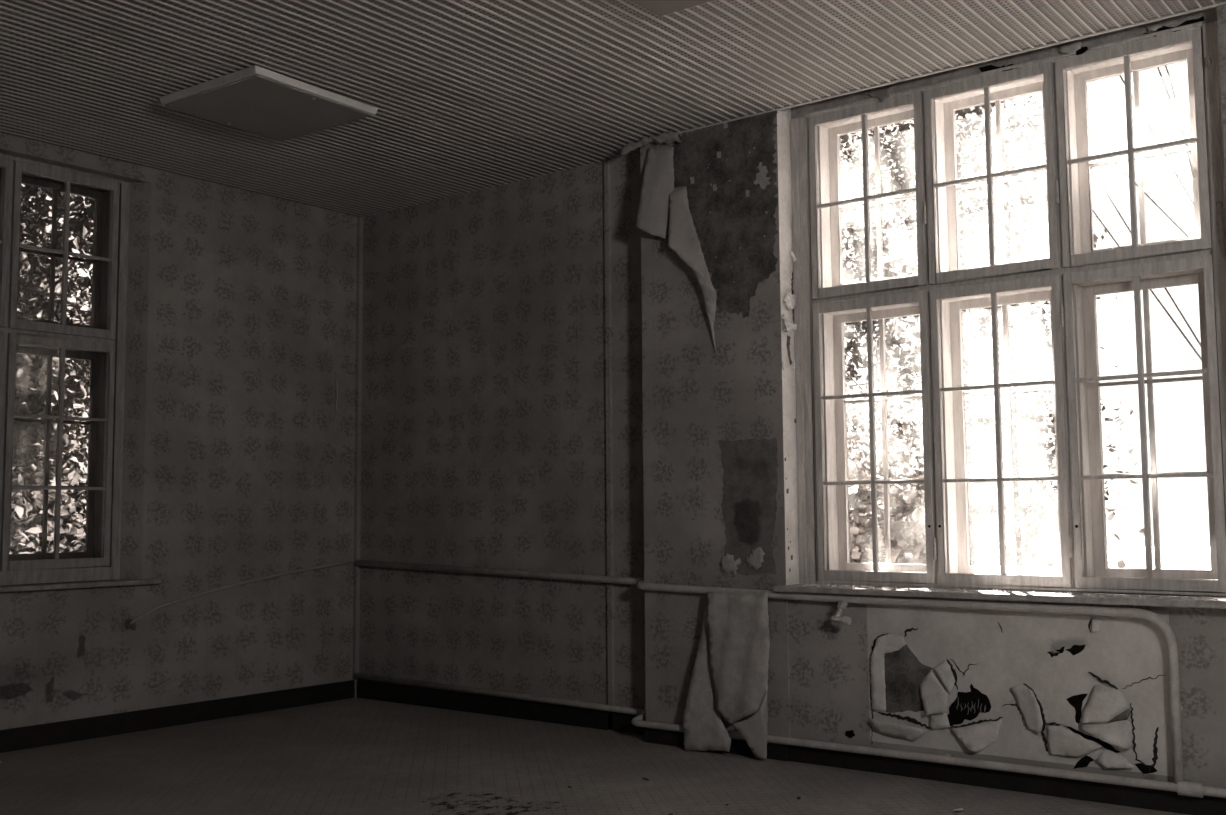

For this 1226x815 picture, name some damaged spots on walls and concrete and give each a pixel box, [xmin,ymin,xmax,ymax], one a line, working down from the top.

flaking render [619,110,797,370]
flaking render [868,628,1003,752]
peeling [1047,644,1086,658]
peeling [1044,672,1135,769]